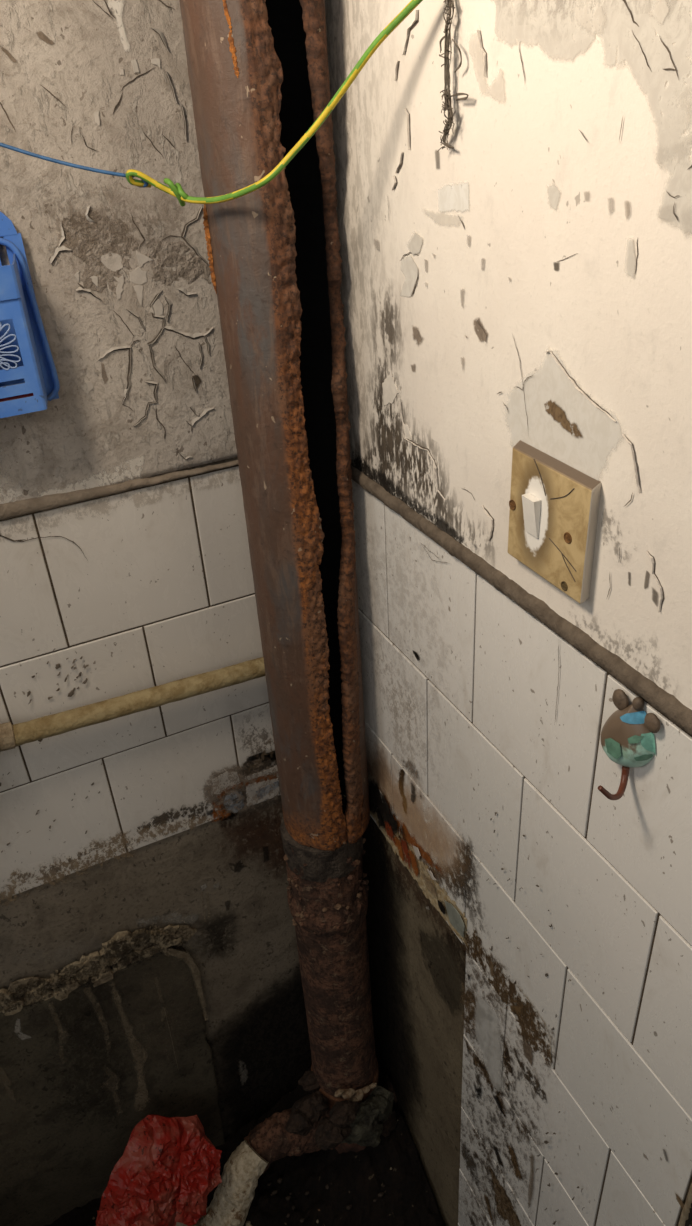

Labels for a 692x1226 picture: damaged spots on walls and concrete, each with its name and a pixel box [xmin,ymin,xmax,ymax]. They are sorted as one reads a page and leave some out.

corrosion [222,0,239,78]
peeling [469,0,692,233]
crack [131,207,210,266]
corrosion [203,204,217,294]
crack [78,283,214,460]
mould [351,303,476,547]
spalling [466,319,488,342]
peeling [544,400,582,437]
corrosion [378,788,439,870]
spalling [0,925,208,1020]
efflorescence [83,980,149,1115]
leakage [421,844,555,1224]